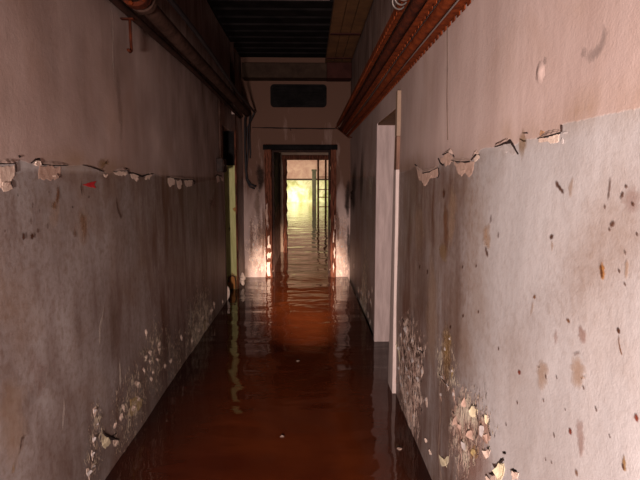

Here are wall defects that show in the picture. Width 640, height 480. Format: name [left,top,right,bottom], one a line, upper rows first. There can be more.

peeling [495,138,519,155]
peeling [537,125,567,144]
peeling [0,159,17,192]
peeling [31,158,68,181]
peeling [104,167,154,182]
peeling [167,176,195,189]
peeling [414,148,480,186]
peeling [83,276,224,480]
peeling [395,299,498,480]
peeling [485,451,519,480]